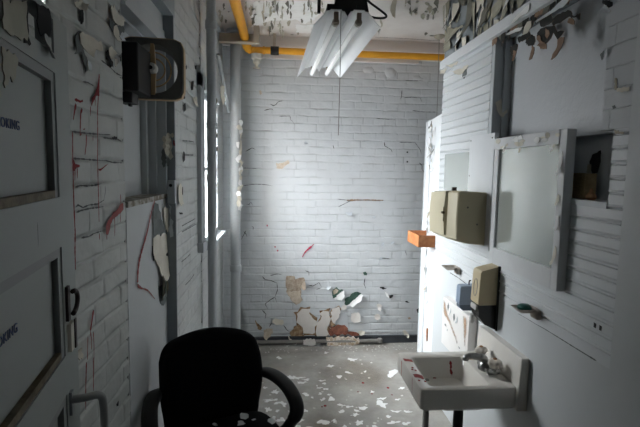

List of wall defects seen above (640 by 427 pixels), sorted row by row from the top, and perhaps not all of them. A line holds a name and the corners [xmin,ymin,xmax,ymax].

peeling [1,0,55,59]
peeling [74,0,121,72]
peeling [109,5,126,42]
peeling [245,0,324,39]
peeling [405,0,581,61]
peeling [152,202,173,306]
crack [262,274,288,331]
flaking render [286,276,365,346]